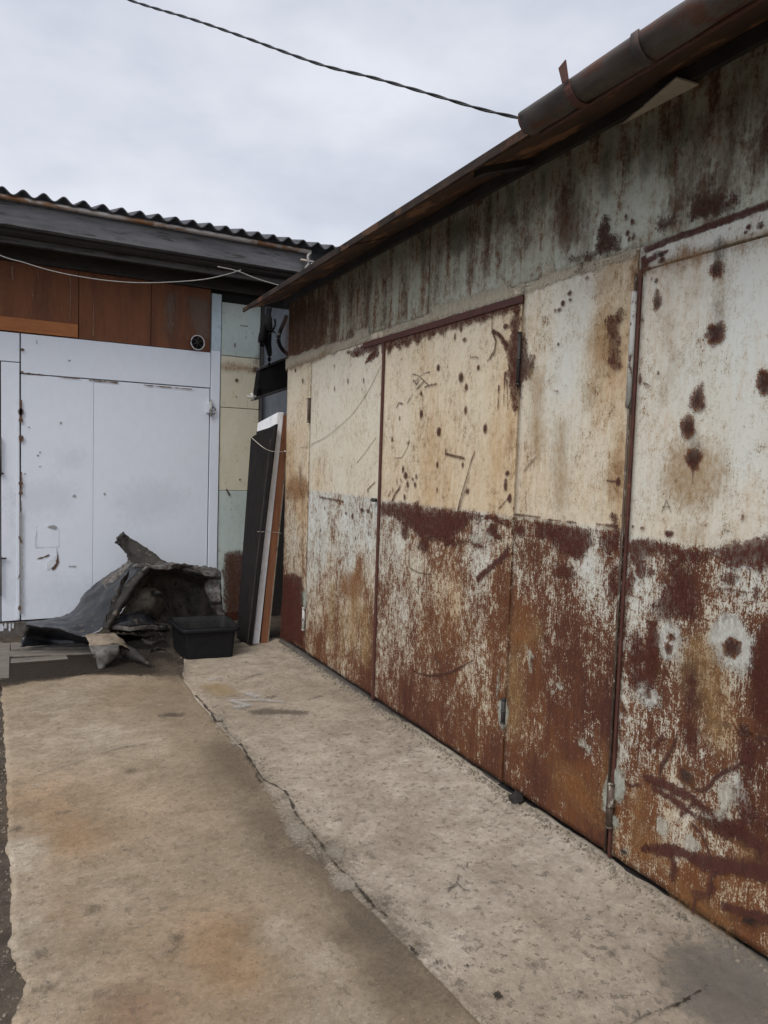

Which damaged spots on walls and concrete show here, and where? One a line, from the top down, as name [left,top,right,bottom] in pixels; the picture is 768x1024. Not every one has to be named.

corrosion [630,87,768,280]
corrosion [703,320,728,345]
corrosion [755,368,768,397]
corrosion [664,381,725,505]
corrosion [475,545,509,582]
peeling [319,474,768,693]
corrosion [656,619,685,662]
corrosion [706,612,756,679]
peeling [747,612,768,731]
crack [195,695,388,916]
corrosion [641,764,768,883]
peeling [704,734,760,826]